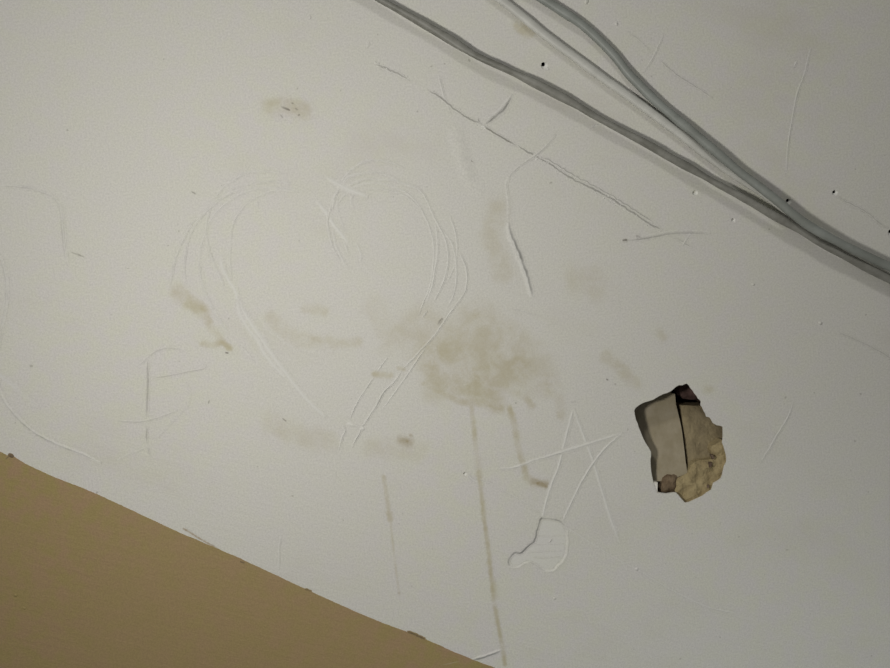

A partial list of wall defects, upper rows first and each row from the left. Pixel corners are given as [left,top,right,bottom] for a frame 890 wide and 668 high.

water stain [255,189,570,668]
spalling [634,384,726,503]